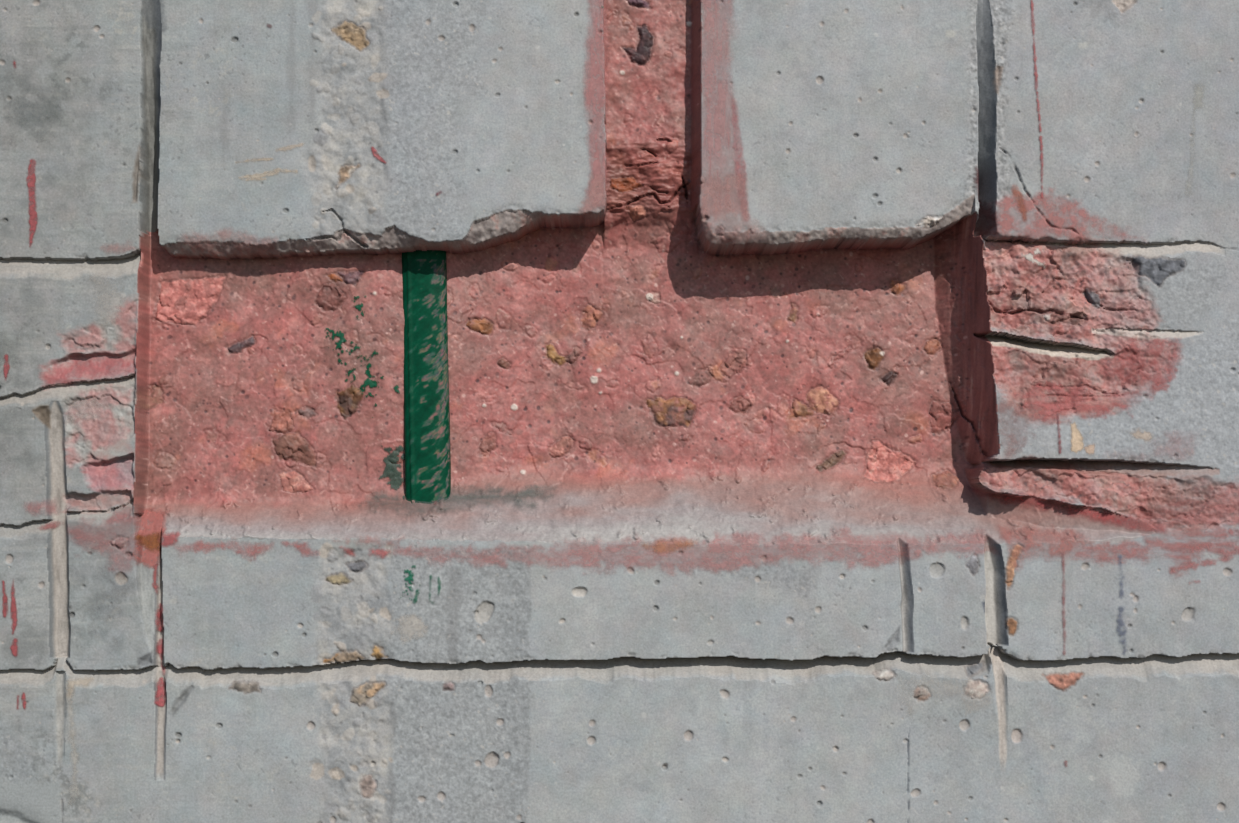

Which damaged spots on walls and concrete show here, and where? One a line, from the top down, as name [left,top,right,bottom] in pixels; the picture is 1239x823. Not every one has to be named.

flaking render [623,26,655,66]
spalling [160,0,606,260]
spalling [698,190,975,256]
flaking render [154,277,227,326]
crack [988,276,1150,321]
spalling [983,234,1186,425]
spalling [32,296,140,512]
flaking render [336,385,365,420]
flaking render [647,350,747,428]
crack [1031,383,1125,400]
flaking render [269,407,318,493]
spalling [975,472,1239,533]